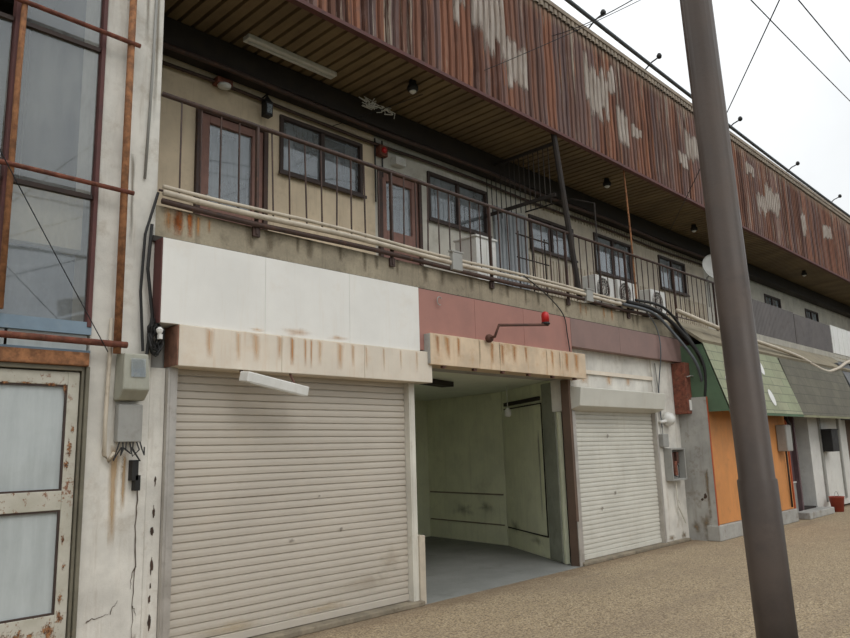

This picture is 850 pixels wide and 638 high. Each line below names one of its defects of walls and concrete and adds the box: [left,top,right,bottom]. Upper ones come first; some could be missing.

corrosion [167,209,210,235]
corrosion [0,594,63,638]